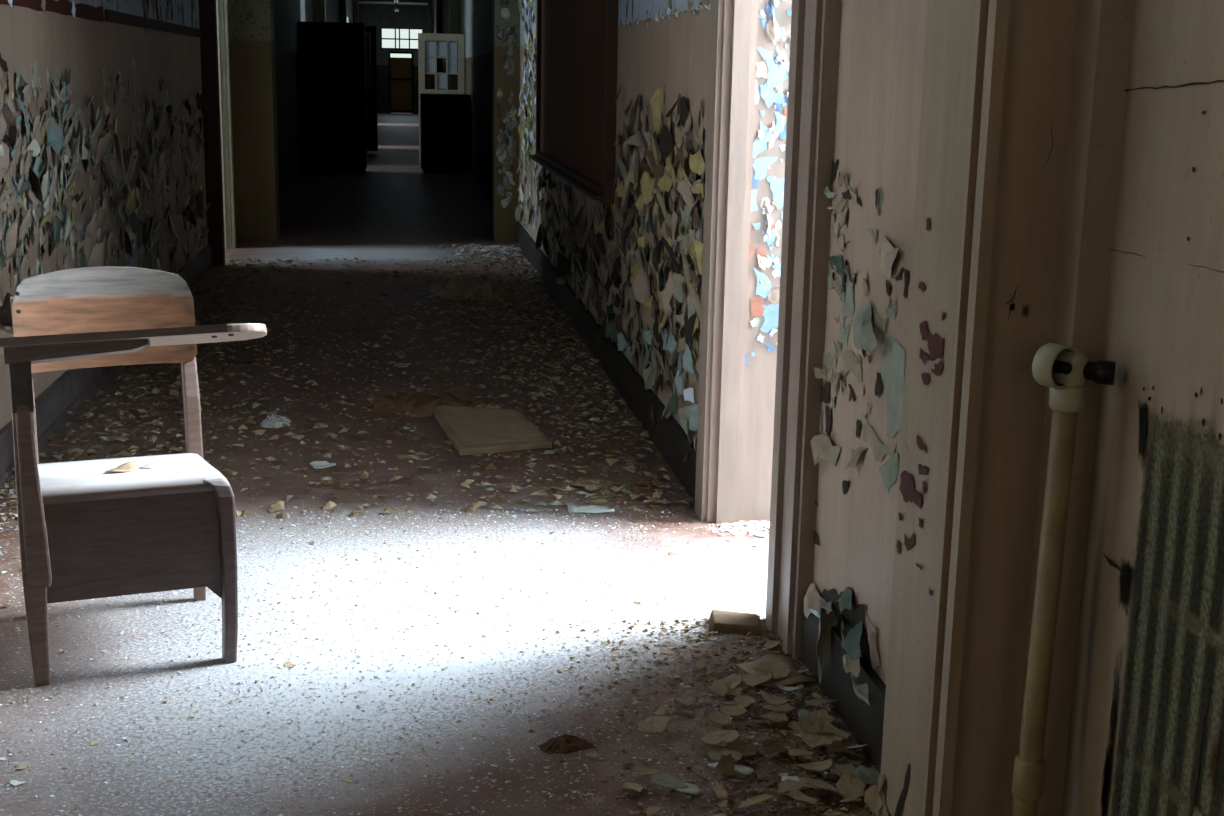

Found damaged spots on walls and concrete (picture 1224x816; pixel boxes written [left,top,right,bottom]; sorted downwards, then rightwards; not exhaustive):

peeling [0,53,211,334]
peeling [496,0,711,461]
peeling [745,0,792,367]
peeling [810,159,908,495]
crack [1125,80,1224,92]
peeling [791,583,881,705]